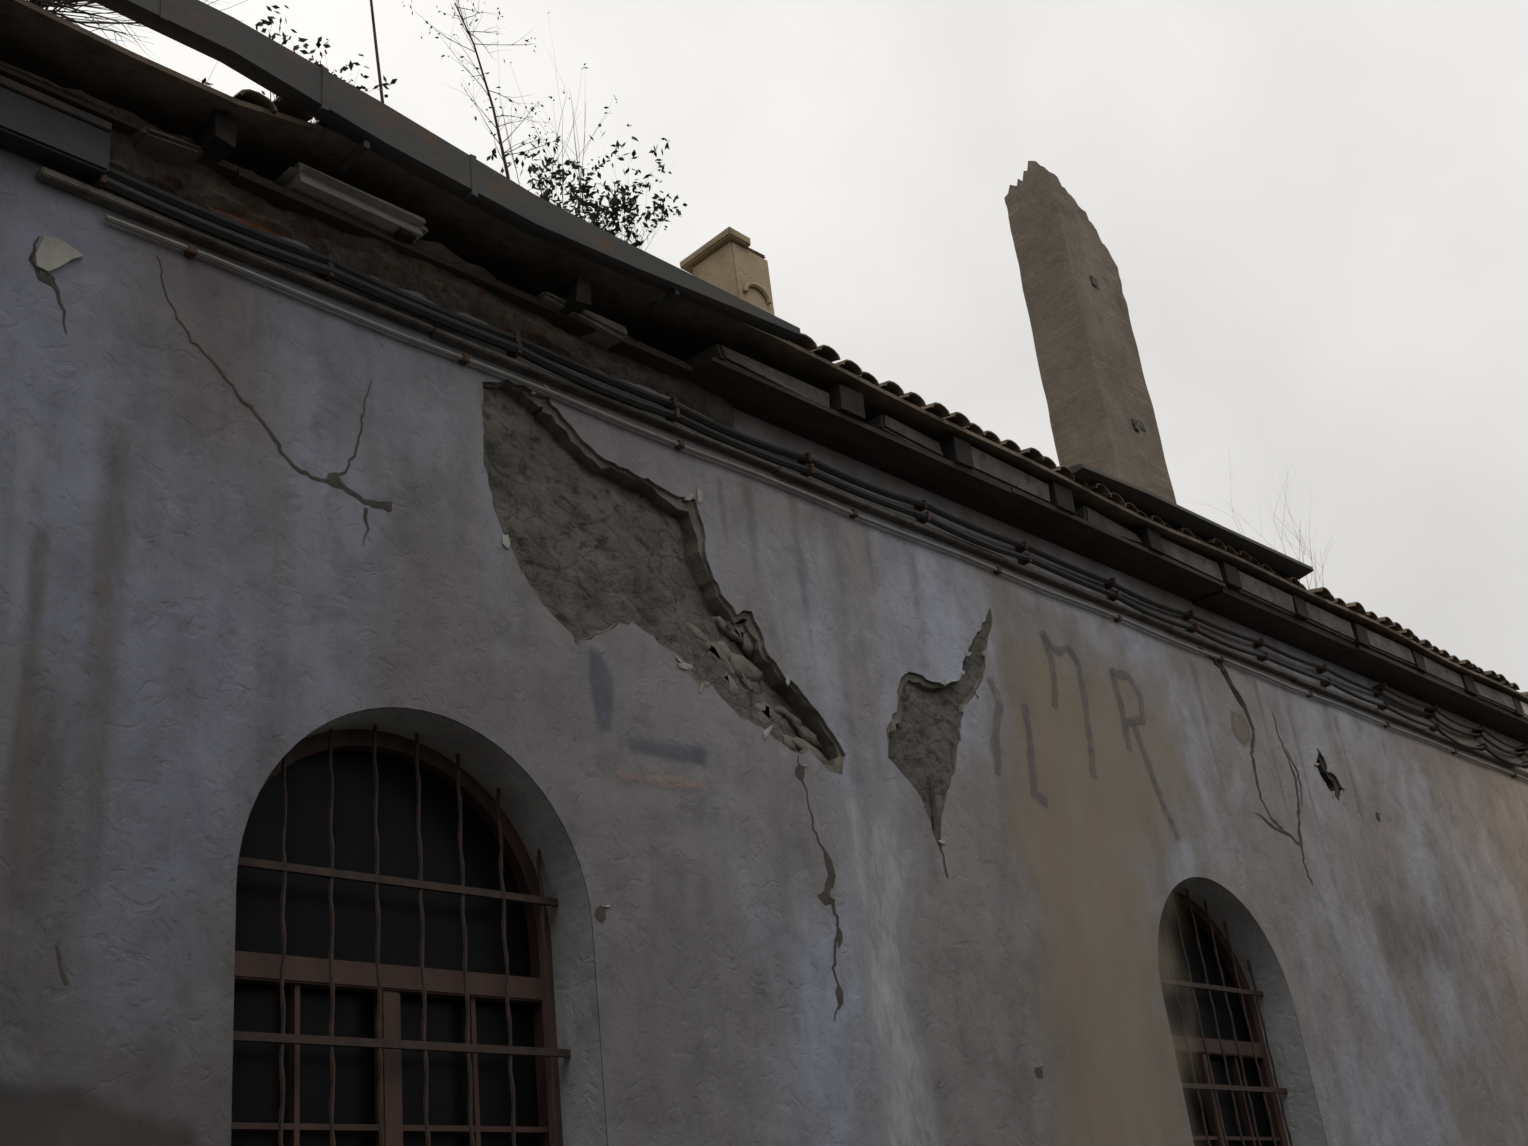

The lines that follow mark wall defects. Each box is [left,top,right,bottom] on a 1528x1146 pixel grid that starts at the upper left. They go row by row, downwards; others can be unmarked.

flaking render [34,235,83,284]
crack [156,255,392,546]
flaking render [481,380,845,781]
flaking render [886,609,991,846]
crack [797,755,843,1020]